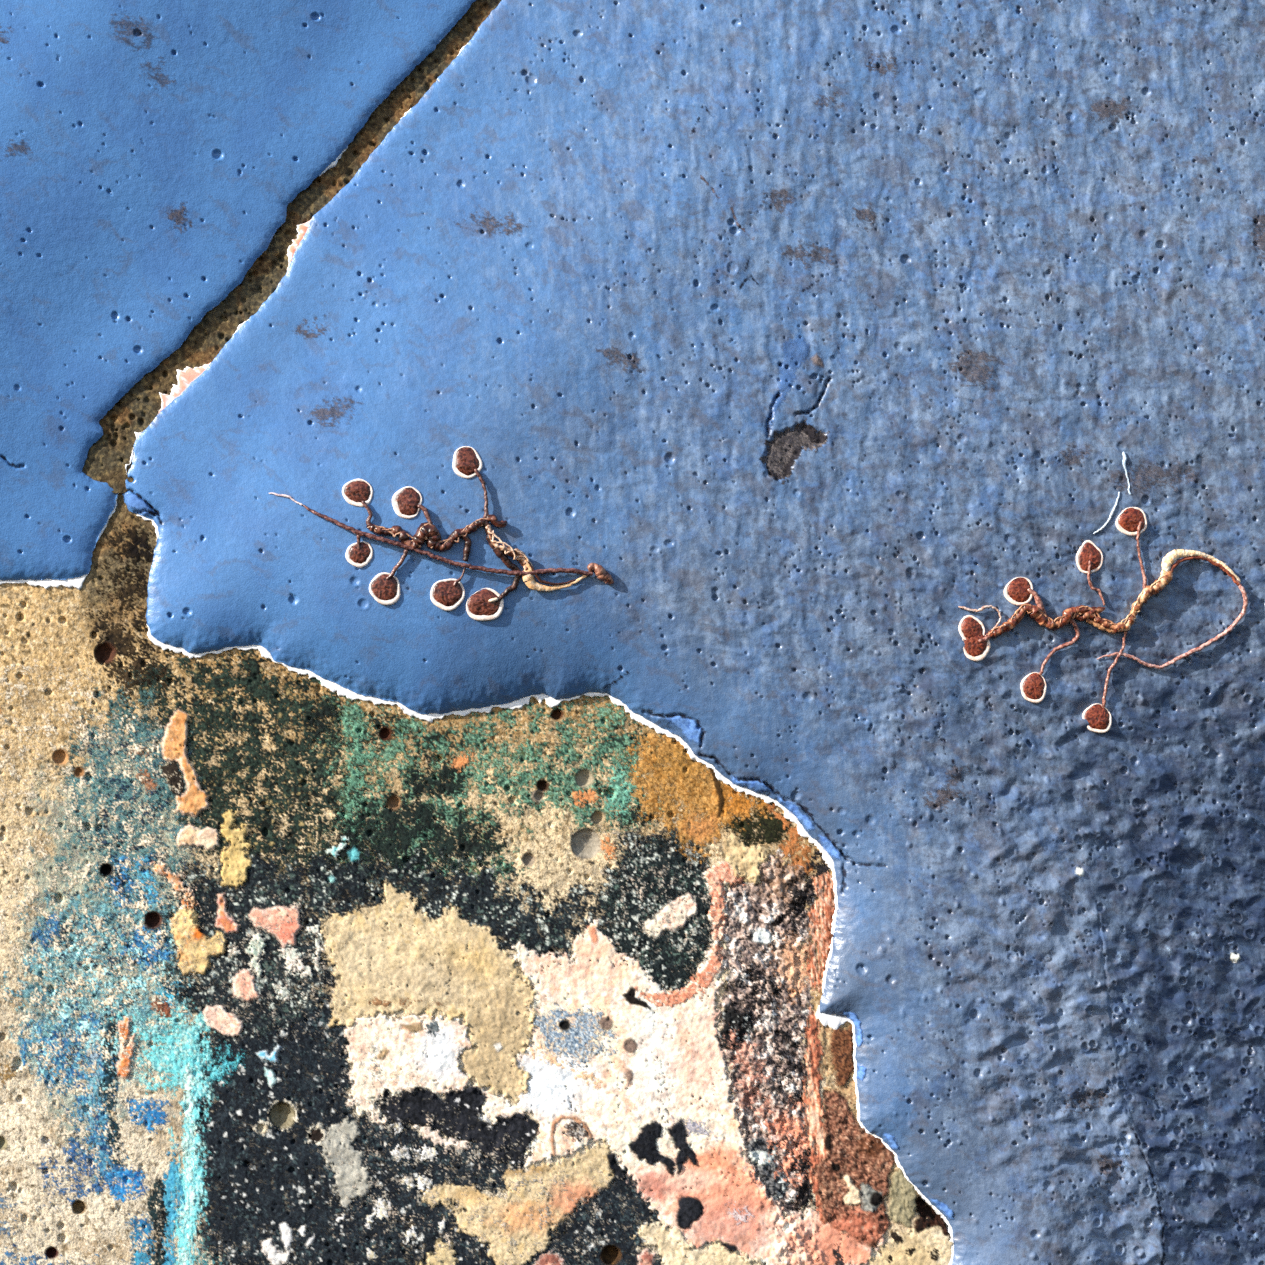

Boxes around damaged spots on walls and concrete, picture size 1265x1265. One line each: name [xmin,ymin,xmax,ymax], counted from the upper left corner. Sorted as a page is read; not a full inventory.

peeling [759,419,830,484]
peeling [0,493,954,1265]